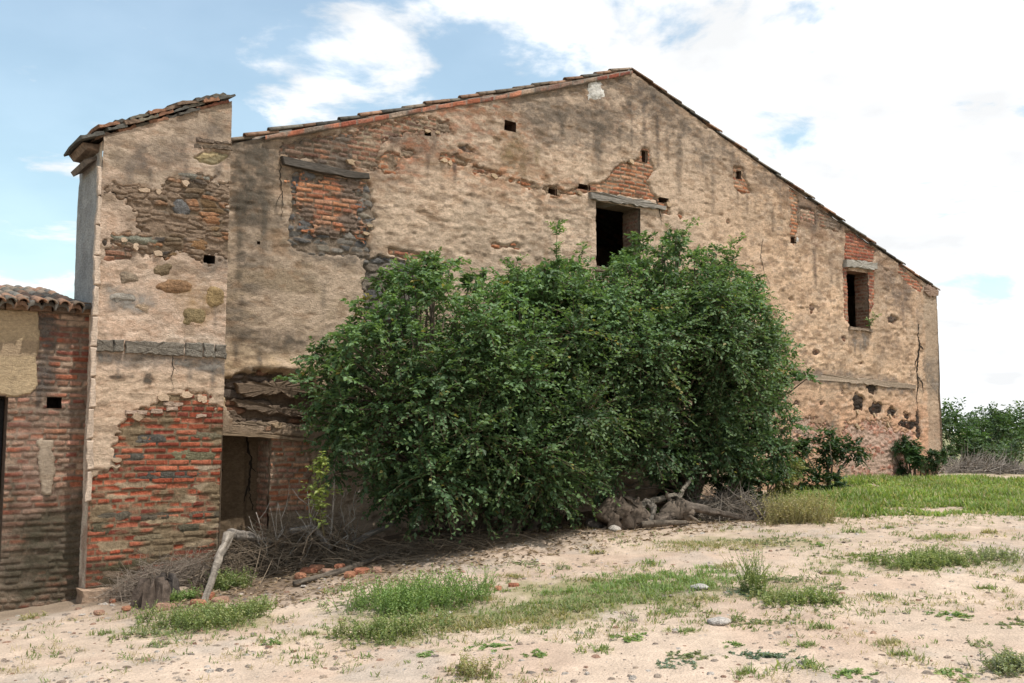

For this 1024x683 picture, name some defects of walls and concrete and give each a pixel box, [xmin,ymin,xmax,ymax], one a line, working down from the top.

spalling [103,151,230,267]
flaking render [279,116,450,338]
flaking render [438,149,682,219]
flaking render [842,232,874,322]
crack [915,325,924,412]
flaking render [85,390,223,615]
crack [243,437,256,510]